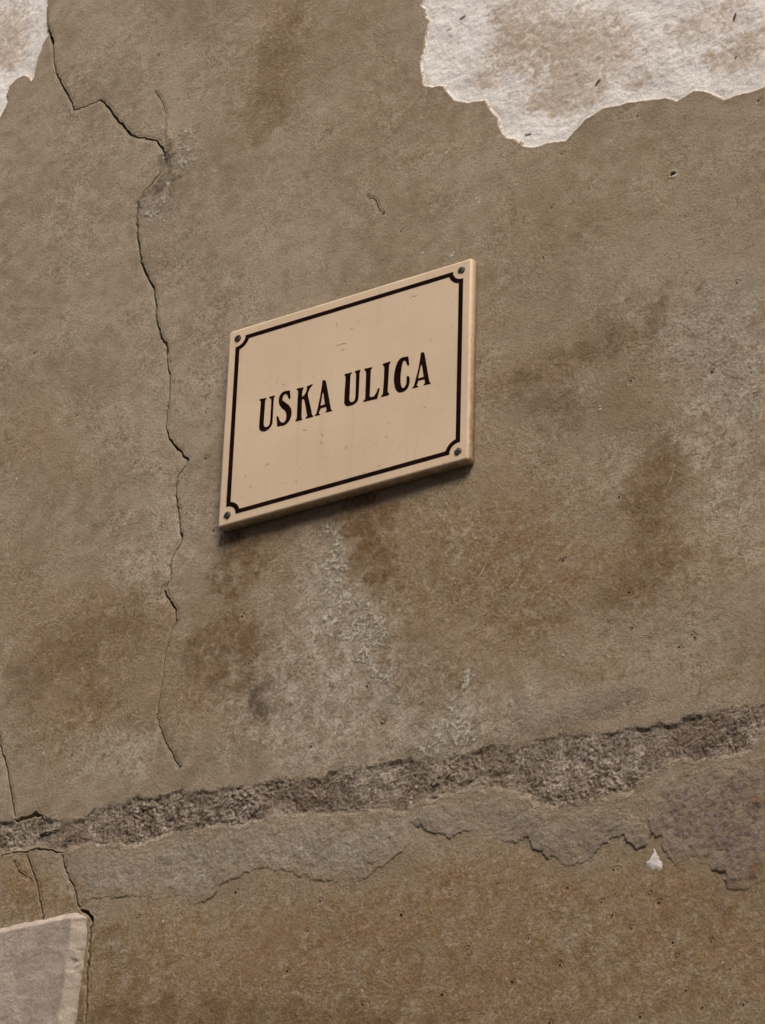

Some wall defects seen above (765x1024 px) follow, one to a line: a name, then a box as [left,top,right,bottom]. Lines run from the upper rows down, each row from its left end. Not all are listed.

flaking render [0,0,51,119]
flaking render [418,0,765,156]
crack [46,0,191,769]
crack [0,732,96,1024]
flaking render [0,699,765,906]